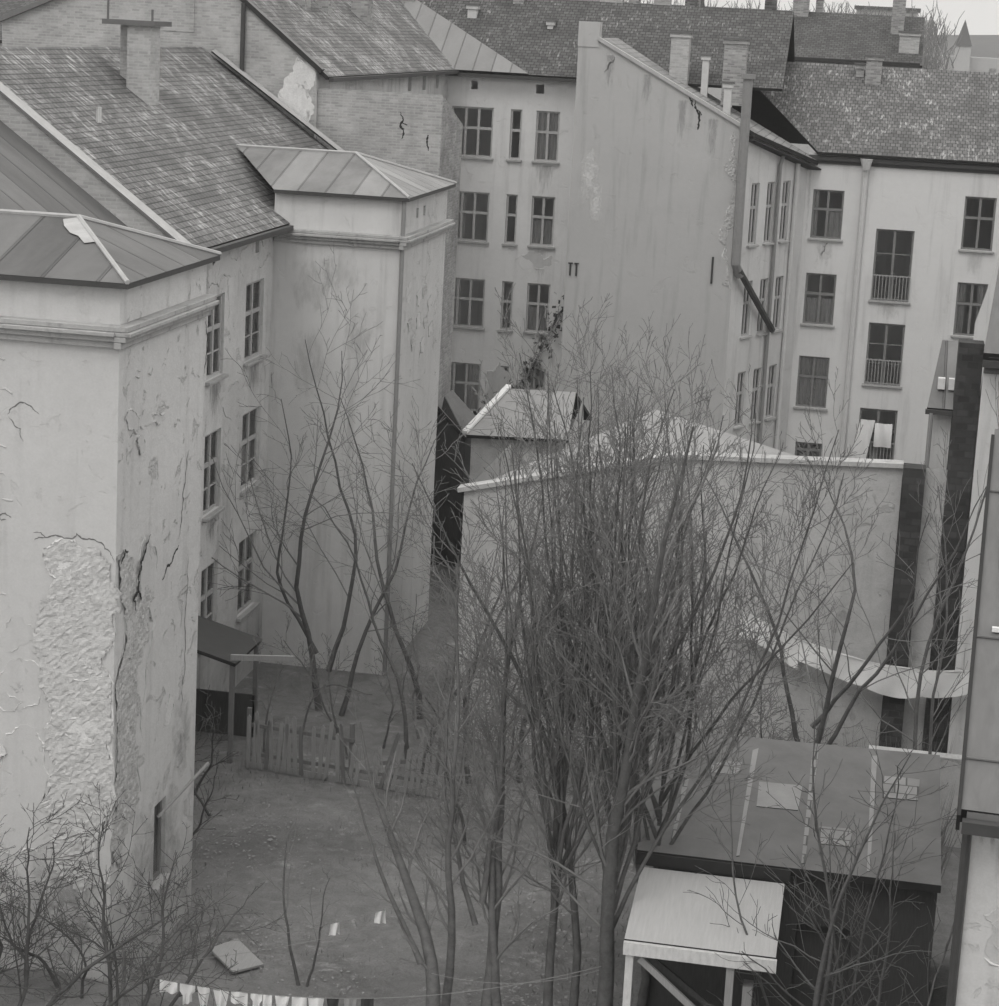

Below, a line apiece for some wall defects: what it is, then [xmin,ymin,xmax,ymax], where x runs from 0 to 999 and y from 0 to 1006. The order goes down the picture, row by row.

peeling [278,57,316,128]
crack [399,112,429,151]
crack [8,402,39,440]
crack [33,451,189,705]
flaking render [0,534,158,893]